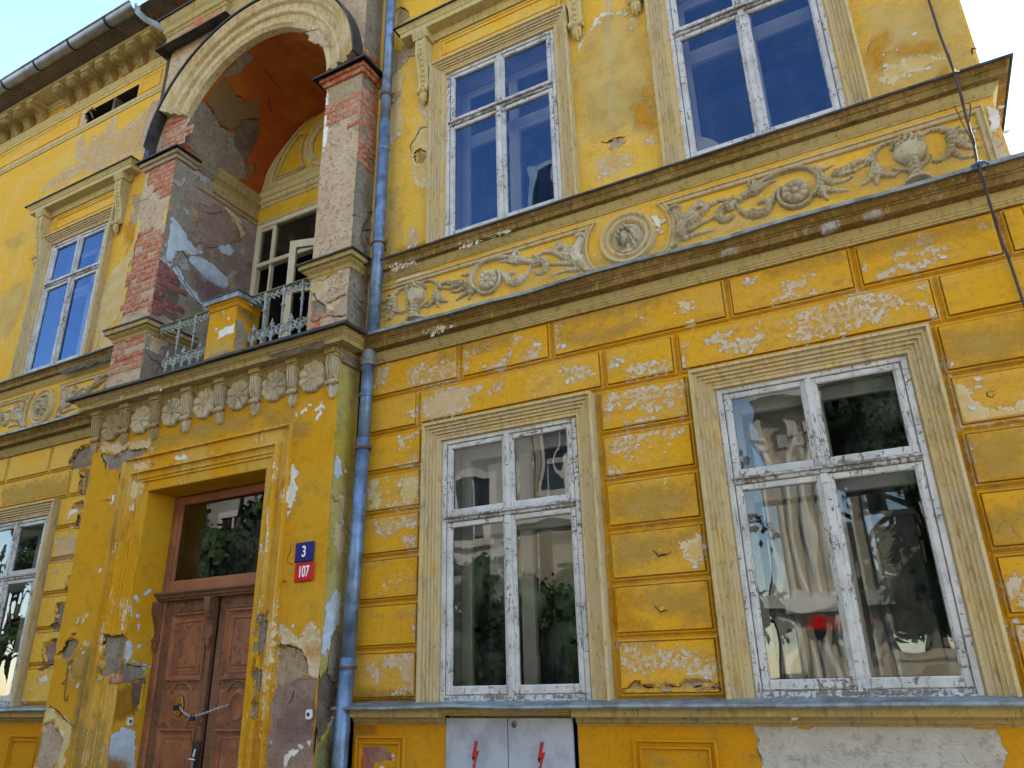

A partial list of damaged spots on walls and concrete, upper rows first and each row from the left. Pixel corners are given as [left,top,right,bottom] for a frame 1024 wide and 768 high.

flaking render [161,52,261,180]
flaking render [322,74,379,174]
flaking render [60,159,229,405]
flaking render [209,312,246,357]
peeling [403,323,567,422]
peeling [770,232,948,350]
flaking render [53,438,153,574]
flaking render [34,706,85,768]
flaking render [22,585,152,712]
flaking render [249,589,343,768]
peeling [615,640,725,694]
flaking render [750,717,1008,768]